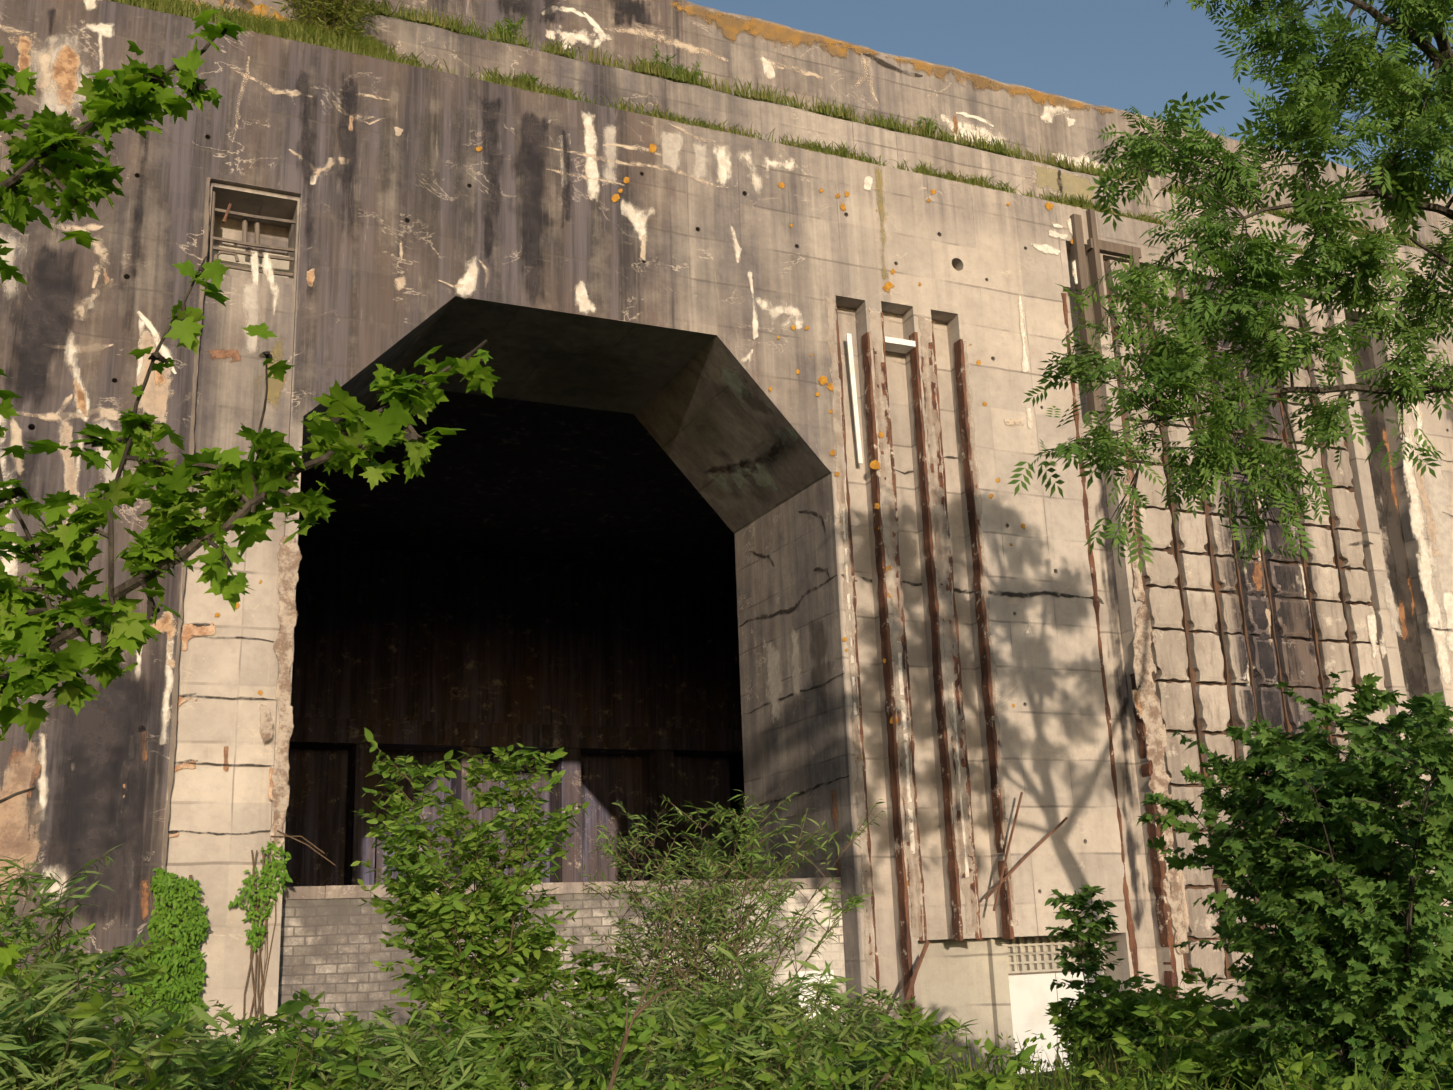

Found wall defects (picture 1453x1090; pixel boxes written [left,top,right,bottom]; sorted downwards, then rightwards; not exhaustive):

spalling [0,25,86,114]
damp [482,99,616,299]
crack [706,427,825,529]
spalling [0,734,47,908]
damp [40,649,151,921]
spalling [260,536,302,855]
crack [739,567,1104,627]
spalling [1122,470,1189,954]